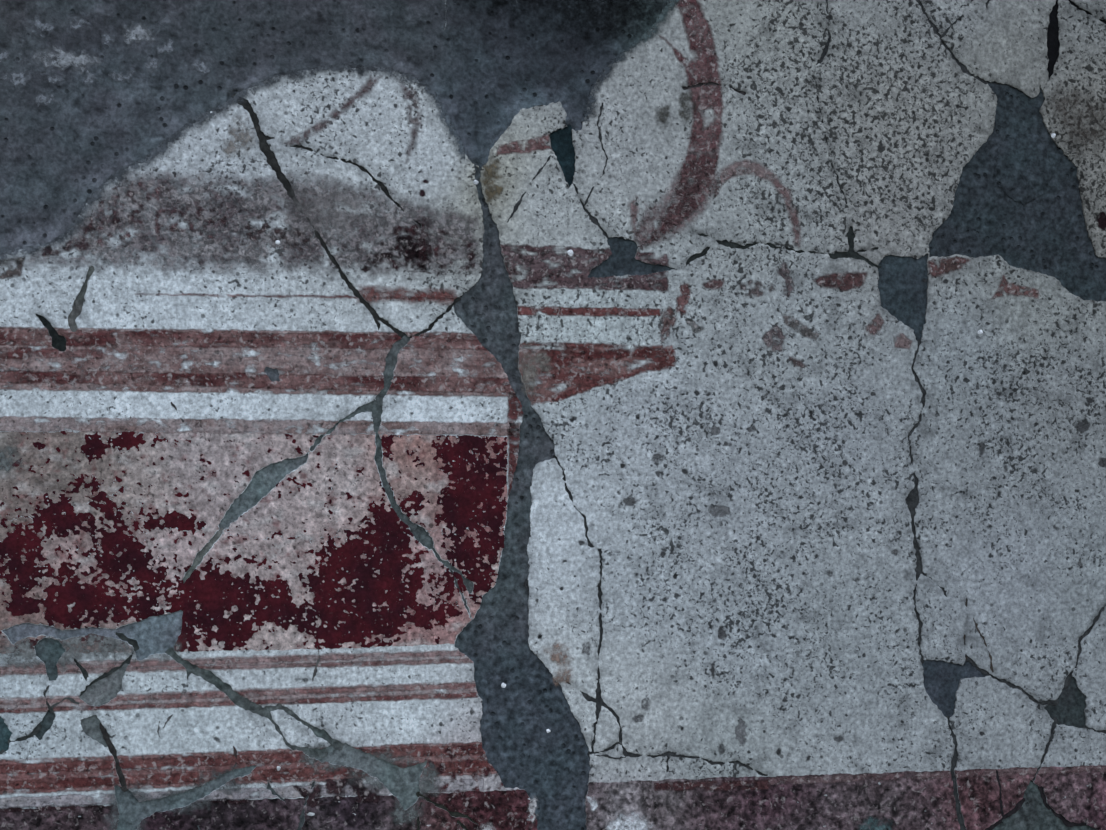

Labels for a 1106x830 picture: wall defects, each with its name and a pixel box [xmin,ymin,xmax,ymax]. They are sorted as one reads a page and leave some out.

damp [487,0,664,40]
crack [1047,0,1106,79]
spalling [549,125,575,187]
crack [686,96,881,268]
spalling [878,82,1106,340]
crack [232,94,473,618]
crack [157,646,345,830]
peeling [0,162,591,830]
crack [553,454,767,776]
spalling [922,660,988,717]
crack [906,340,1106,830]
spalling [1044,677,1086,728]